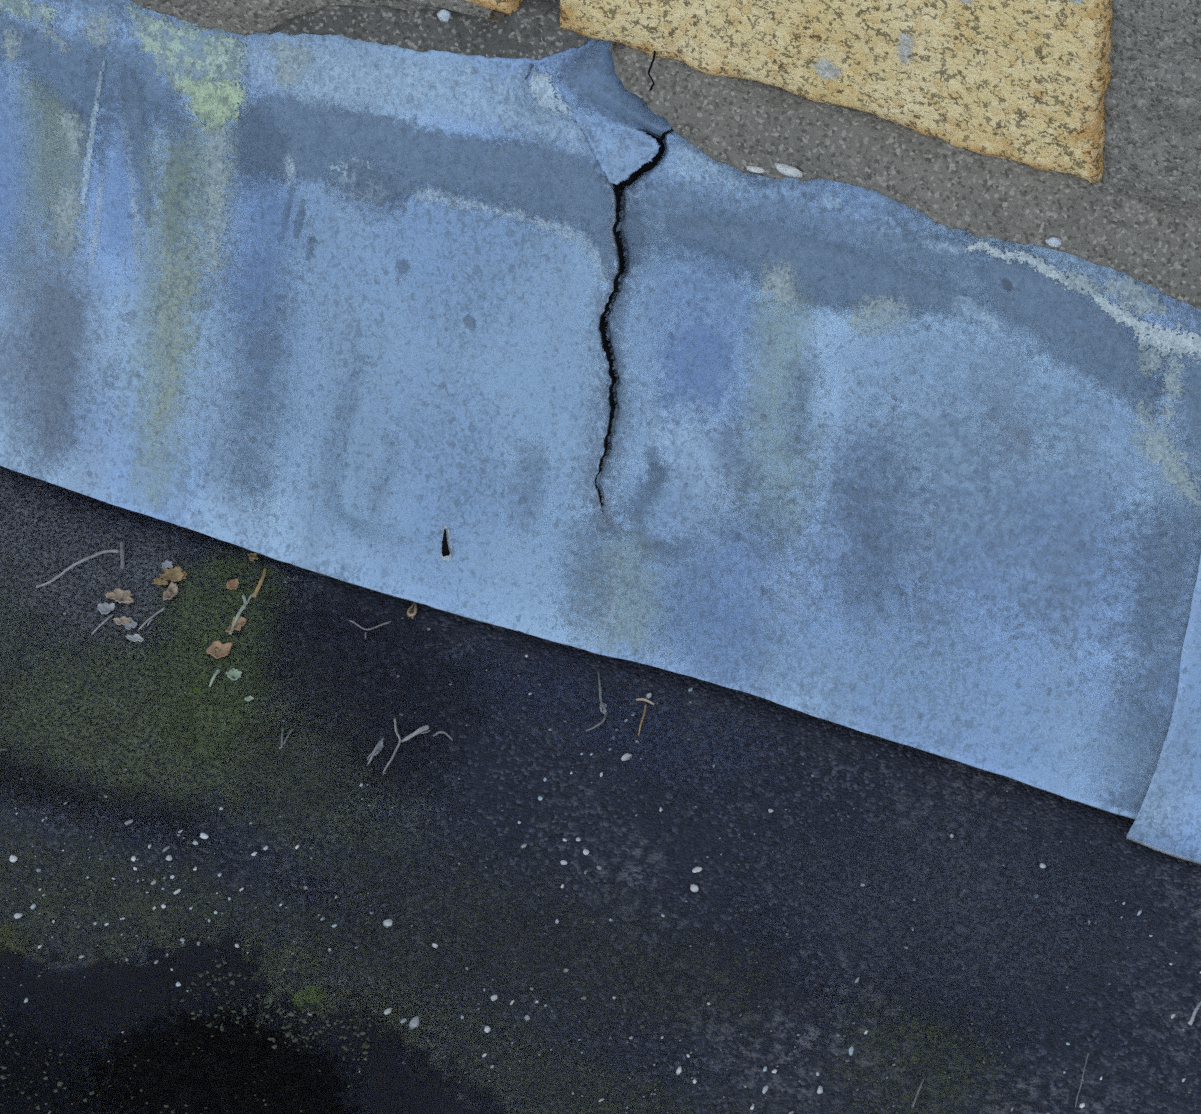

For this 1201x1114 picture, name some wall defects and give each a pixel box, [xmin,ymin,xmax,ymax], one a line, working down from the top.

crack [648,51,656,91]
damp [0,0,1201,812]
crack [573,114,674,539]